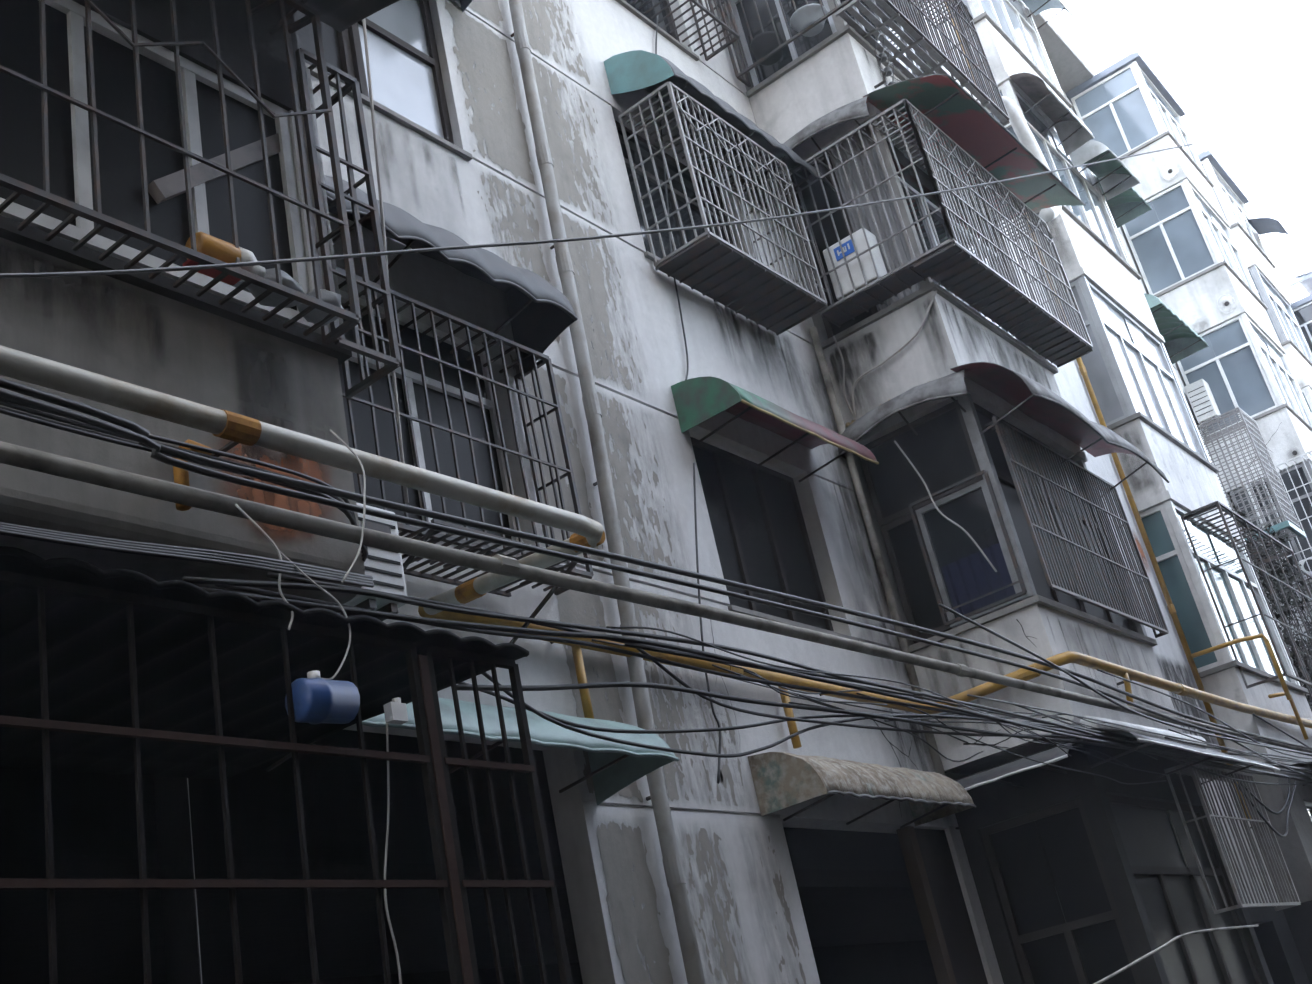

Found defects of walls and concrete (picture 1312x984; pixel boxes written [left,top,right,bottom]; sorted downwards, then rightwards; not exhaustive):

peeling [445,0,551,282]
peeling [510,0,679,575]
corrosion [223,439,328,518]
peeling [597,821,673,984]
peeling [686,828,743,984]
peeling [760,836,806,984]